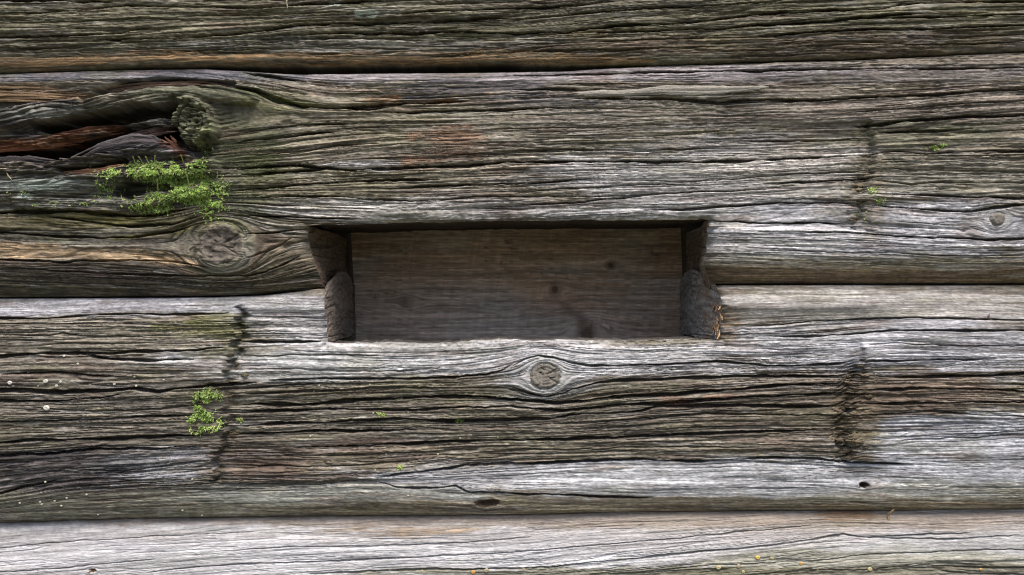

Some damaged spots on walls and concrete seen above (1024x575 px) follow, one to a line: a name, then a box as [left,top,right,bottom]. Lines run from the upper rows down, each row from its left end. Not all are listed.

crack [0,340,1024,499]